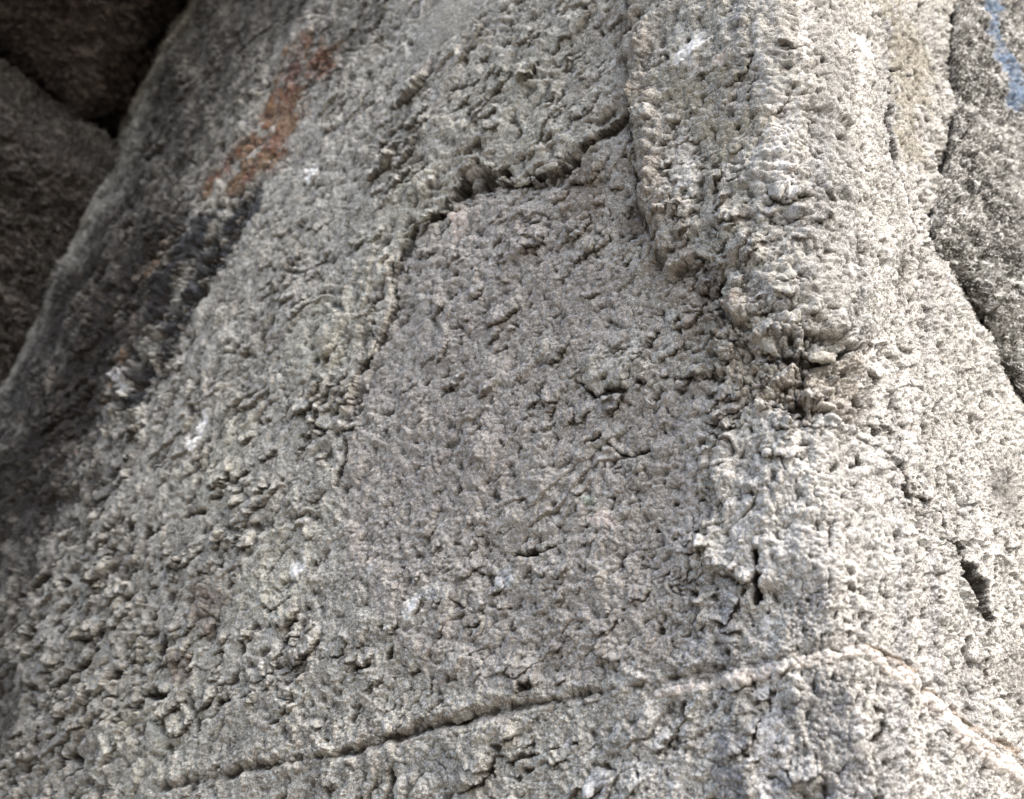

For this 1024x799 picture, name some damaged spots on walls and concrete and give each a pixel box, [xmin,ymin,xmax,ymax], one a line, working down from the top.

rust [189,17,353,218]
crack [745,546,765,608]
crack [891,437,998,692]
crack [213,688,253,710]
crack [867,704,890,746]
crack [467,739,581,774]